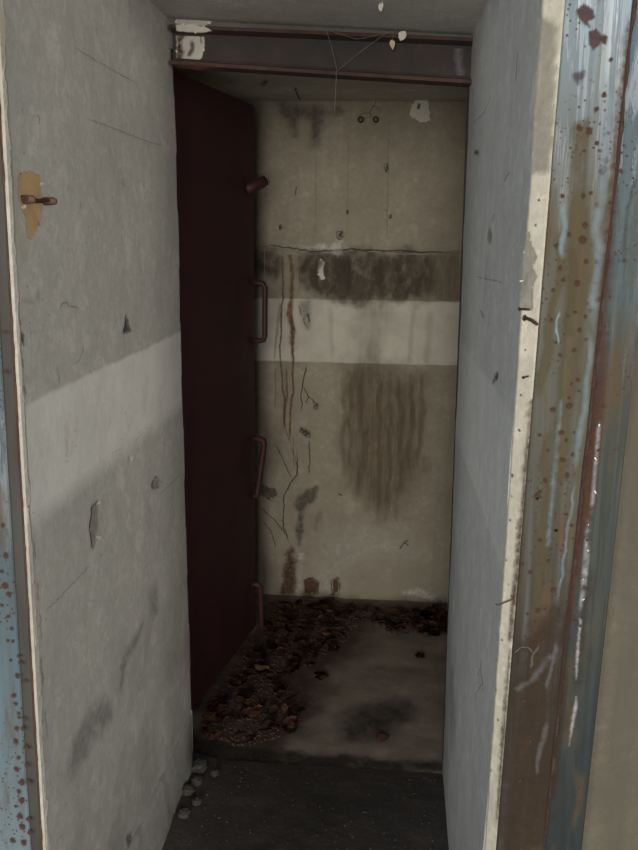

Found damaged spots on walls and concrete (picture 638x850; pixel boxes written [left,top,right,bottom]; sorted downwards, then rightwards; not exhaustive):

corrosion [577,4,607,49]
peeling [18,171,43,239]
peeling [317,259,325,280]
crack [272,244,441,253]
water stain [300,251,426,304]
peeling [519,224,537,310]
corrosion [279,255,295,437]
crack [300,368,314,410]
corrosion [535,184,616,628]
corrosion [0,102,43,850]
crack [263,441,311,547]
water stain [296,488,317,539]